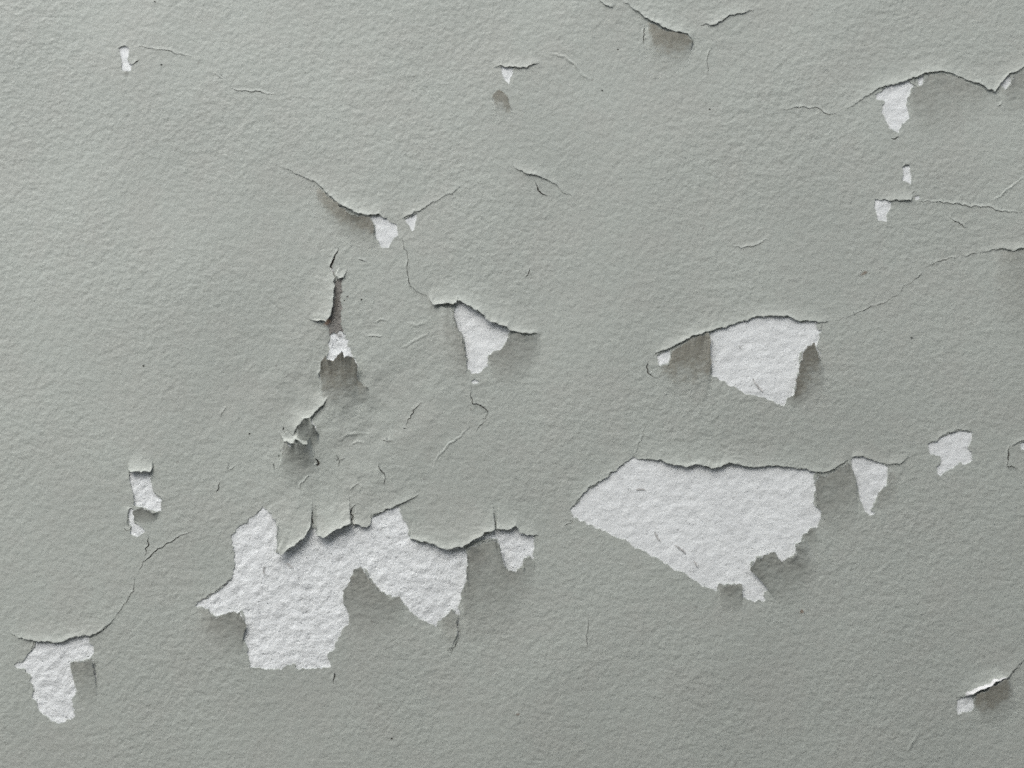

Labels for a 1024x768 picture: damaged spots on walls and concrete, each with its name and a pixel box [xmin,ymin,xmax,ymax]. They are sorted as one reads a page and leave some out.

peeling [600,0,754,71]
peeling [842,53,1024,140]
peeling [874,157,1024,222]
crack [833,216,977,321]
peeling [646,301,831,407]
peeling [118,449,171,537]
peeling [195,157,542,670]
peeling [563,423,909,613]
peeling [928,421,972,476]
crack [91,530,194,637]
peeling [8,606,118,724]
peeling [951,650,1024,727]